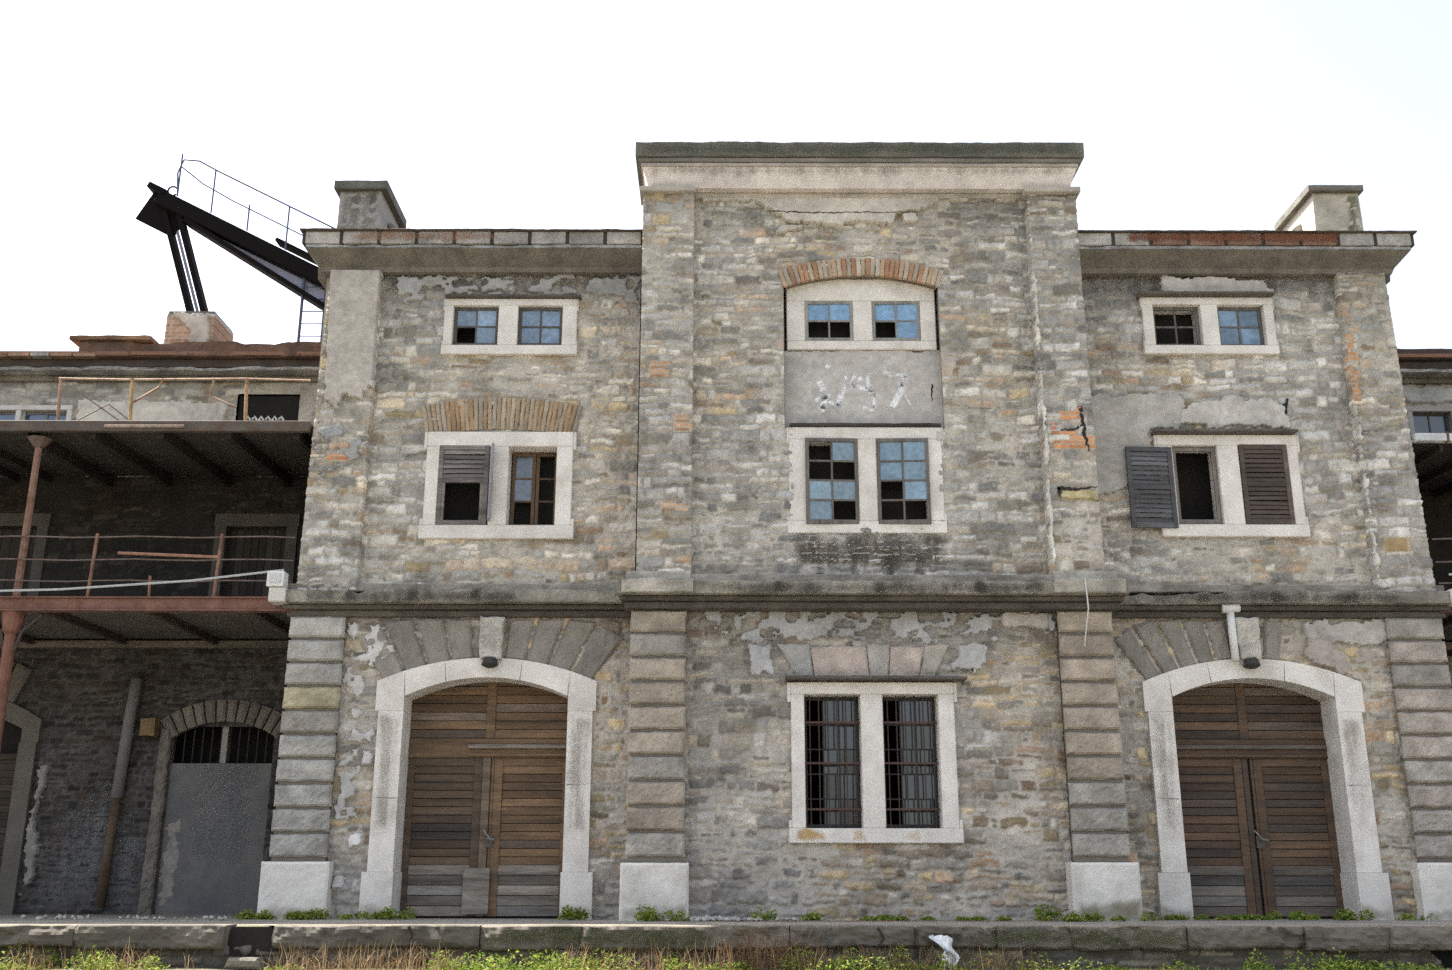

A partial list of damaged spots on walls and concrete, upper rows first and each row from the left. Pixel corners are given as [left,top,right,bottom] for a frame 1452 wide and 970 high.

peeling [1091,393,1291,498]
peeling [18,764,52,896]